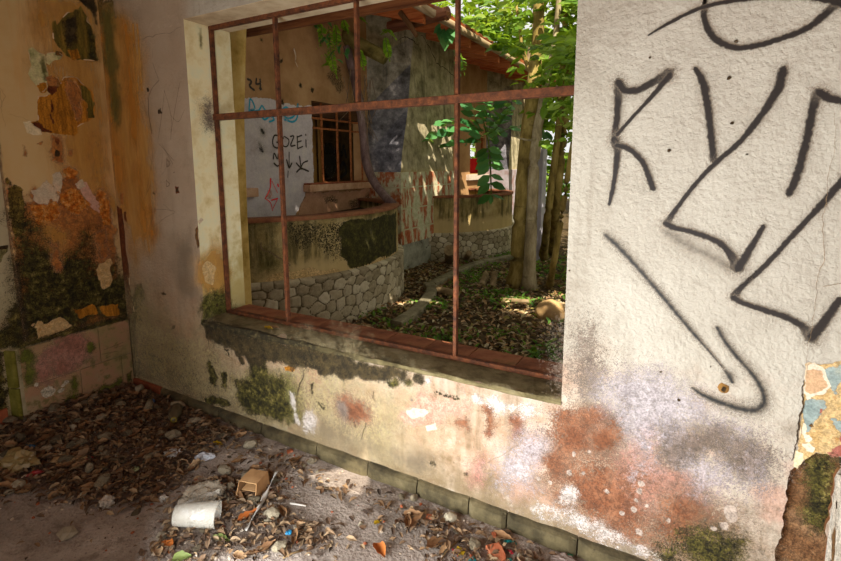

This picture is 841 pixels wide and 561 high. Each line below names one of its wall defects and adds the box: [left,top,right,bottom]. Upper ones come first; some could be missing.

peeling [23,6,99,136]
water stain [79,0,114,26]
spalling [117,193,134,320]
water stain [0,203,420,460]
water stain [454,416,470,433]
water stain [464,315,787,561]
spalling [775,361,841,561]